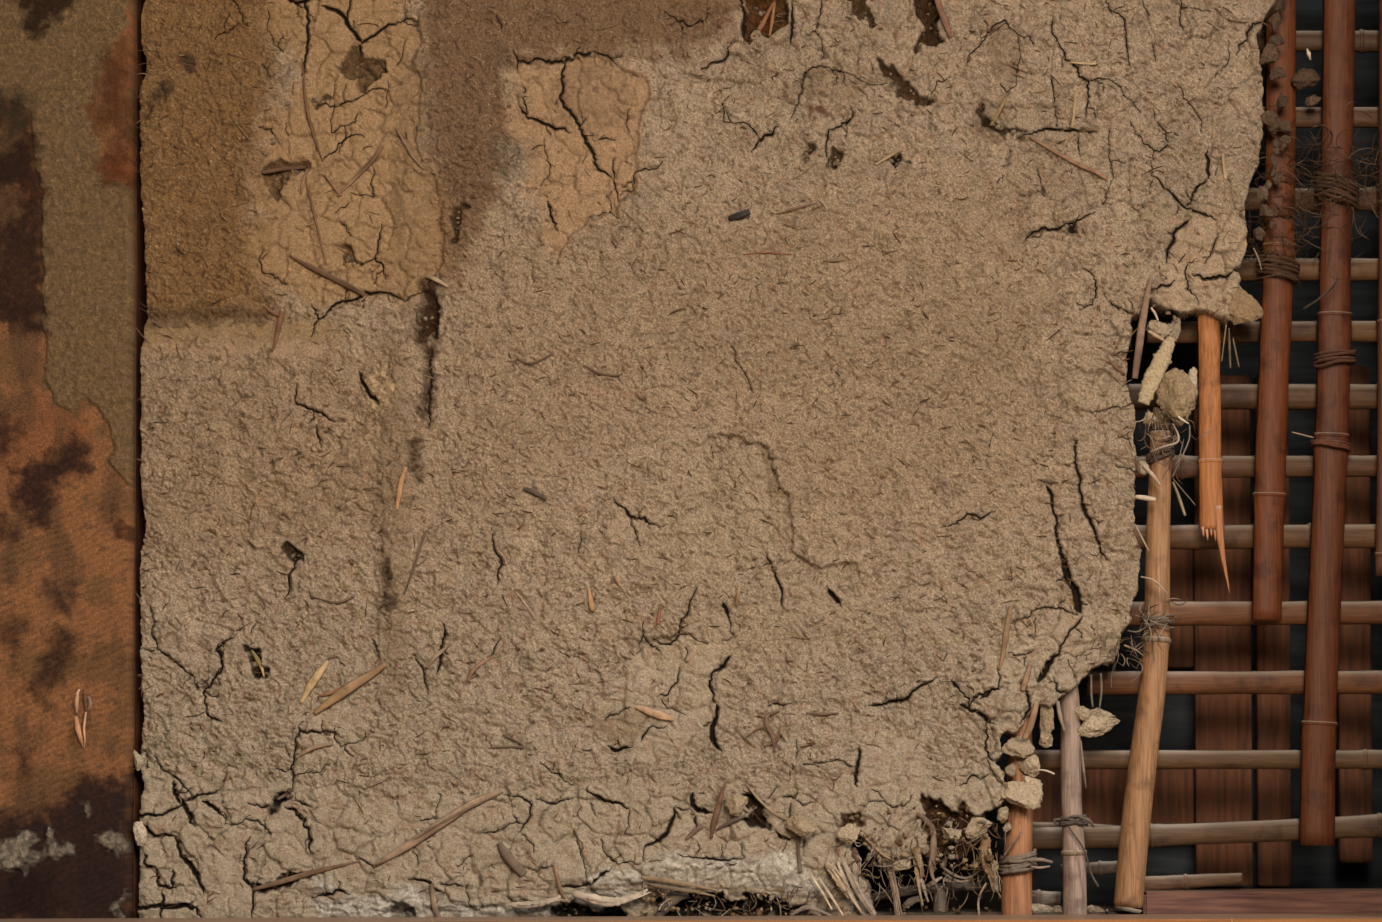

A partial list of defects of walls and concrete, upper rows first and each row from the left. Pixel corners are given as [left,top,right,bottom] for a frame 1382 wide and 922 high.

damp [0,94,47,331]
damp [20,0,72,38]
crack [215,0,418,159]
crack [496,15,663,230]
crack [926,0,1237,313]
crack [311,168,433,424]
damp [13,439,90,525]
crack [135,607,256,722]
crack [605,590,734,752]
damp [0,776,134,919]
crack [133,721,371,918]
crack [408,762,745,906]